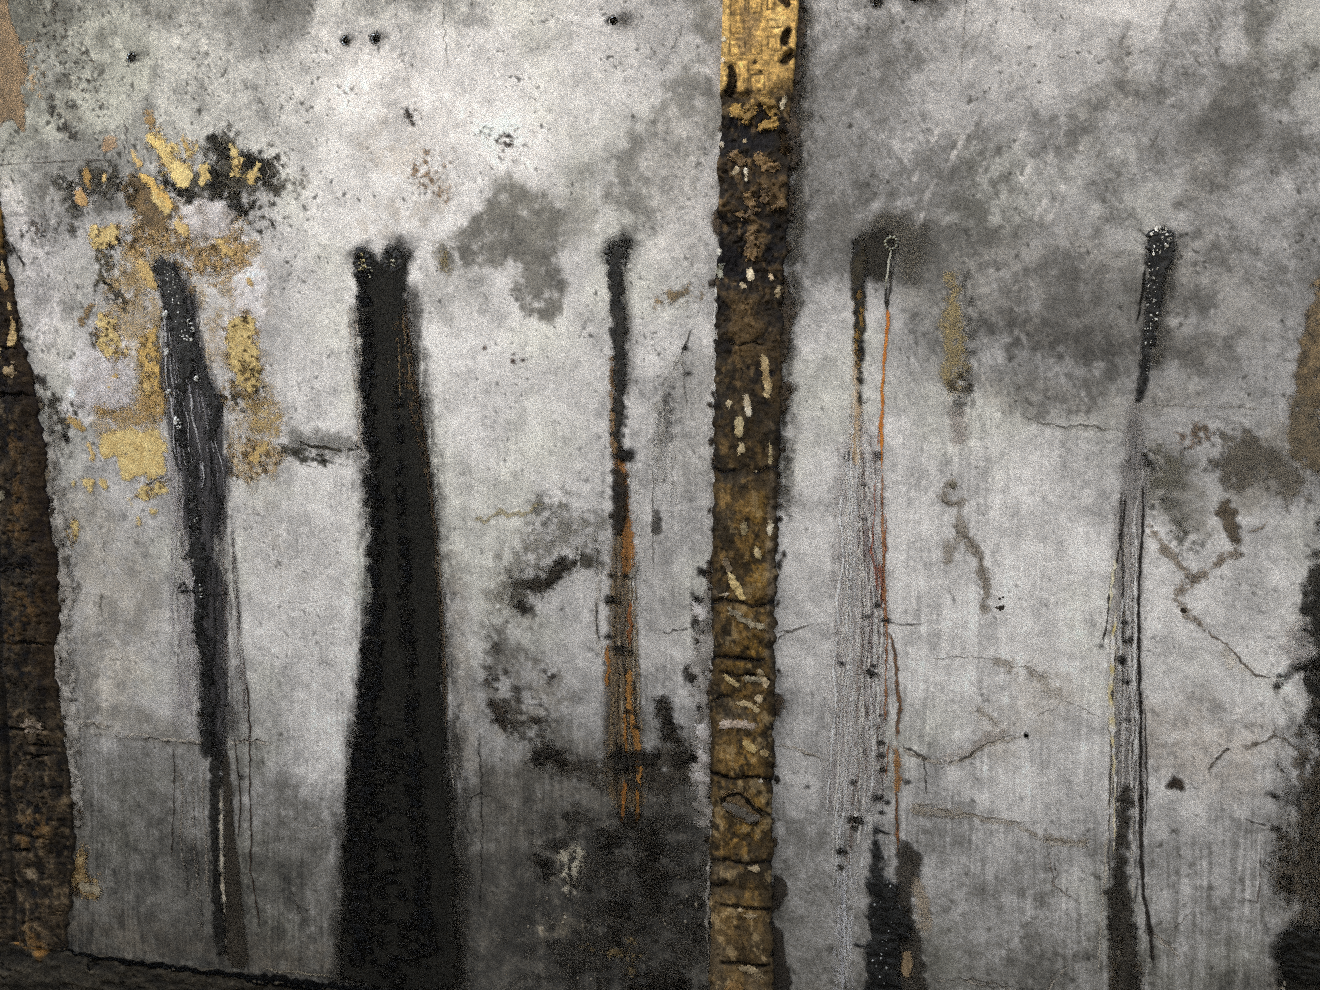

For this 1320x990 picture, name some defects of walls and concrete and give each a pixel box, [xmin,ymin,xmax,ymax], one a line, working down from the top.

spalling [0,201,24,378]
peeling [20,718,43,734]
spalling [32,109,255,827]
water stain [95,221,283,969]
peeling [229,144,261,185]
peeling [219,310,283,482]
water stain [267,247,473,990]
water stain [476,241,712,990]
water stain [827,212,932,990]
rust [870,251,902,850]
water stain [1096,229,1320,990]